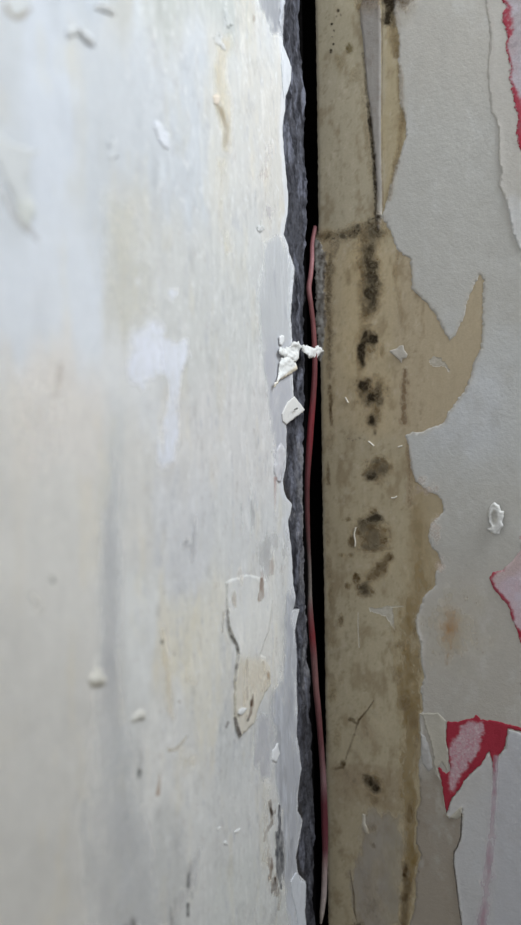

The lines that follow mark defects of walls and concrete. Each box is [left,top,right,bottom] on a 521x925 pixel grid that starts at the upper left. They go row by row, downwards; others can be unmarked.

leakage [356,0,409,58]
leakage [316,43,388,434]
leakage [400,369,409,425]
spalling [225,0,329,925]
leakage [362,455,392,484]
leakage [341,509,394,597]
leakage [393,539,428,925]
leakage [363,774,381,802]